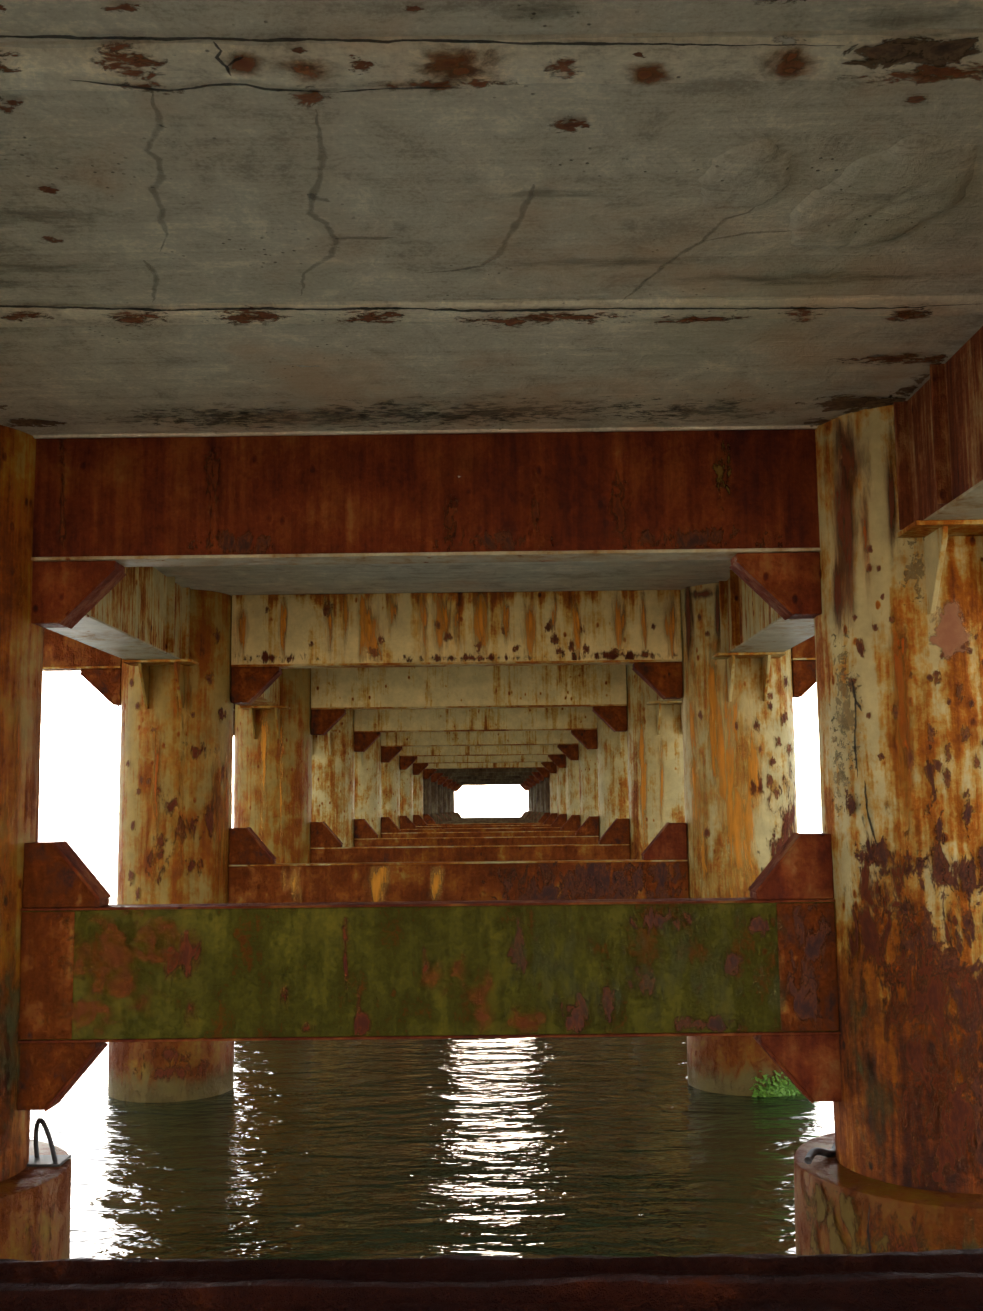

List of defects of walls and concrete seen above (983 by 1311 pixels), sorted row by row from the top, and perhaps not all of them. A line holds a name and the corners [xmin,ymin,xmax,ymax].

rust [0,51,20,73]
rust [91,43,183,95]
rust [0,96,24,114]
rust [189,530,273,554]
rust [459,530,529,551]
rust [638,525,782,549]
rust [833,420,869,626]
rust [886,455,896,546]
rust [239,594,398,664]
rust [482,586,798,938]
rust [844,623,983,1191]